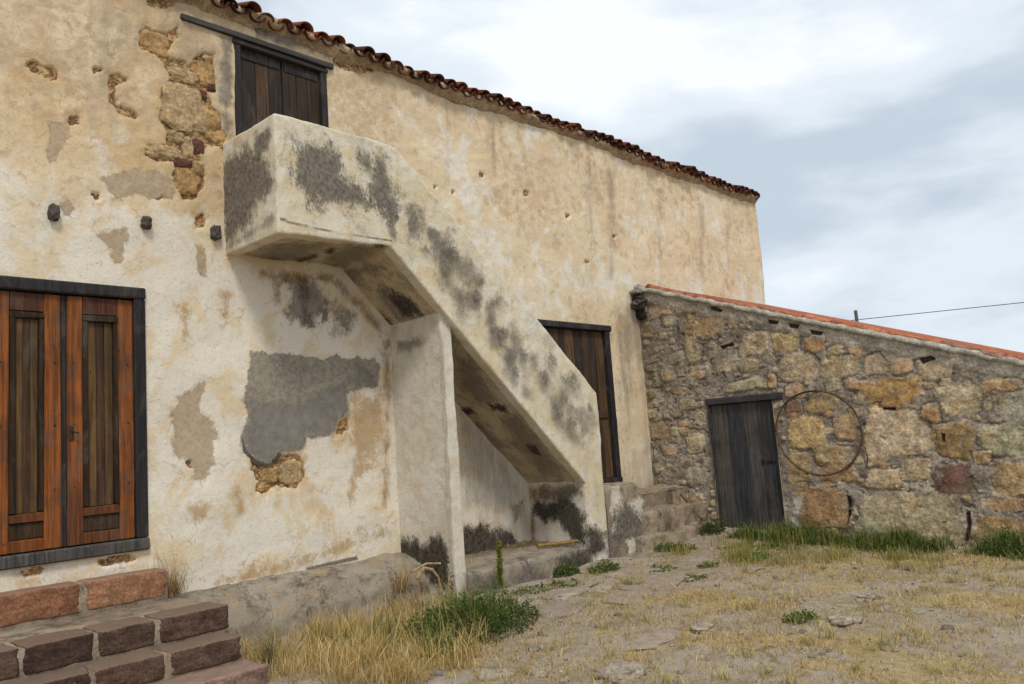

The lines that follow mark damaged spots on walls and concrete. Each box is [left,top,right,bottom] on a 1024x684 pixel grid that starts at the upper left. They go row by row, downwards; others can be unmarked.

flaking render [27,60,58,81]
flaking render [91,28,227,201]
mould [223,128,277,248]
leakage [255,133,597,442]
peeling [169,381,220,480]
flaking render [251,454,305,493]
peeling [336,393,382,499]
mould [401,532,550,596]
mould [463,522,517,554]
leakage [513,485,643,568]